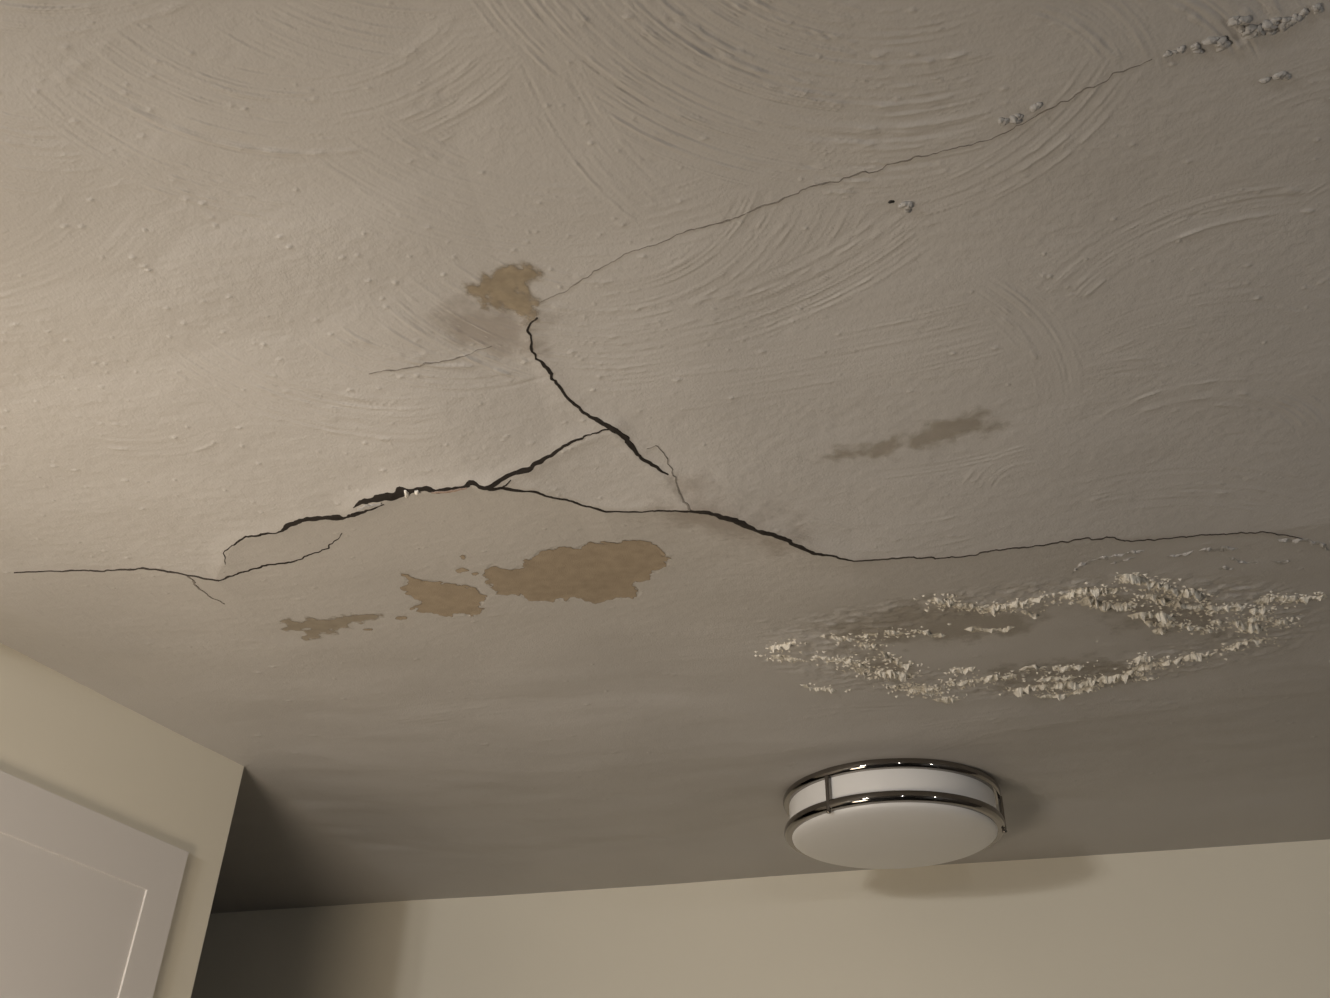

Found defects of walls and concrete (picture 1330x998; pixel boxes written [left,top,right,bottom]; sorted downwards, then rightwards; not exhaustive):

water stain [467,264,542,320]
crack [14,59,1302,604]
peeling [281,540,671,641]